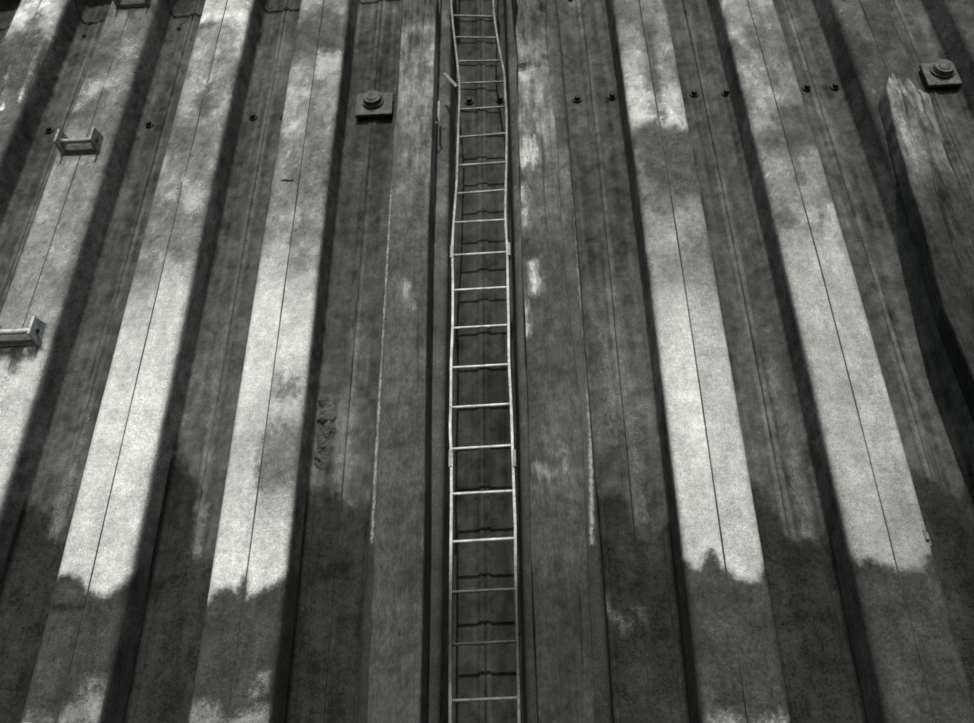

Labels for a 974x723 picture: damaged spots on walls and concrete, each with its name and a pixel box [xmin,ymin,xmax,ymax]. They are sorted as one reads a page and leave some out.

leakage [276,374,296,397]
leakage [21,574,149,723]
leakage [188,573,298,723]
leakage [676,548,791,723]
leakage [836,554,974,723]